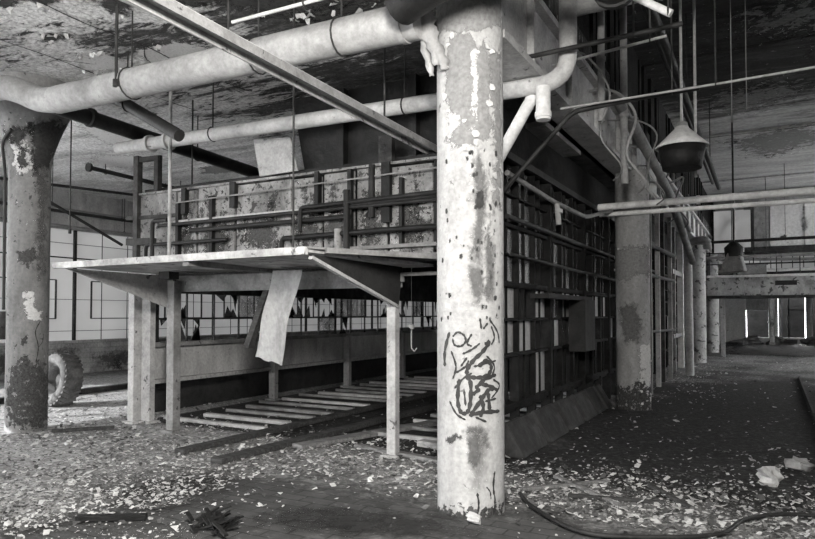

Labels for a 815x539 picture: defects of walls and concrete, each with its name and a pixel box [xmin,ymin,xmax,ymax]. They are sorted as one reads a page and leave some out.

peeling [0,0,60,14]
peeling [85,0,133,19]
peeling [719,0,815,41]
peeling [39,32,77,45]
peeling [74,51,134,75]
peeling [136,40,207,64]
peeling [436,0,503,260]
peeling [0,139,33,175]
spalling [16,247,37,265]
peeling [22,291,43,321]